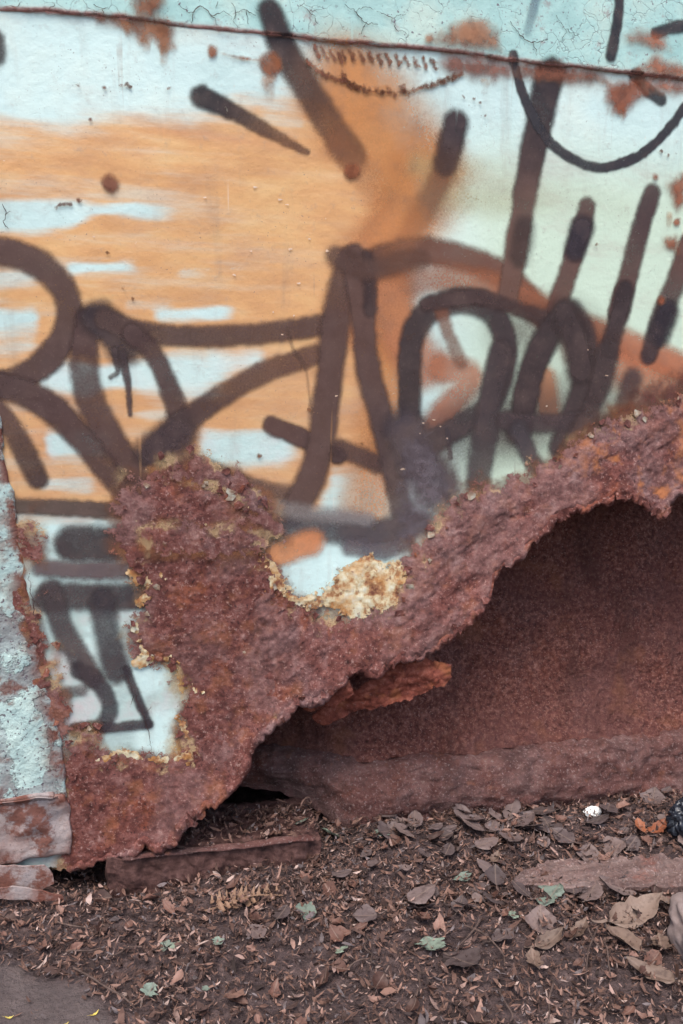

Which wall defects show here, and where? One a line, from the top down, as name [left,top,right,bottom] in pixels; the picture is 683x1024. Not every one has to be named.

crack [178,2,254,28]
crack [300,5,409,37]
crack [510,15,577,56]
peeling [254,552,408,620]
corrosion [12,375,683,871]